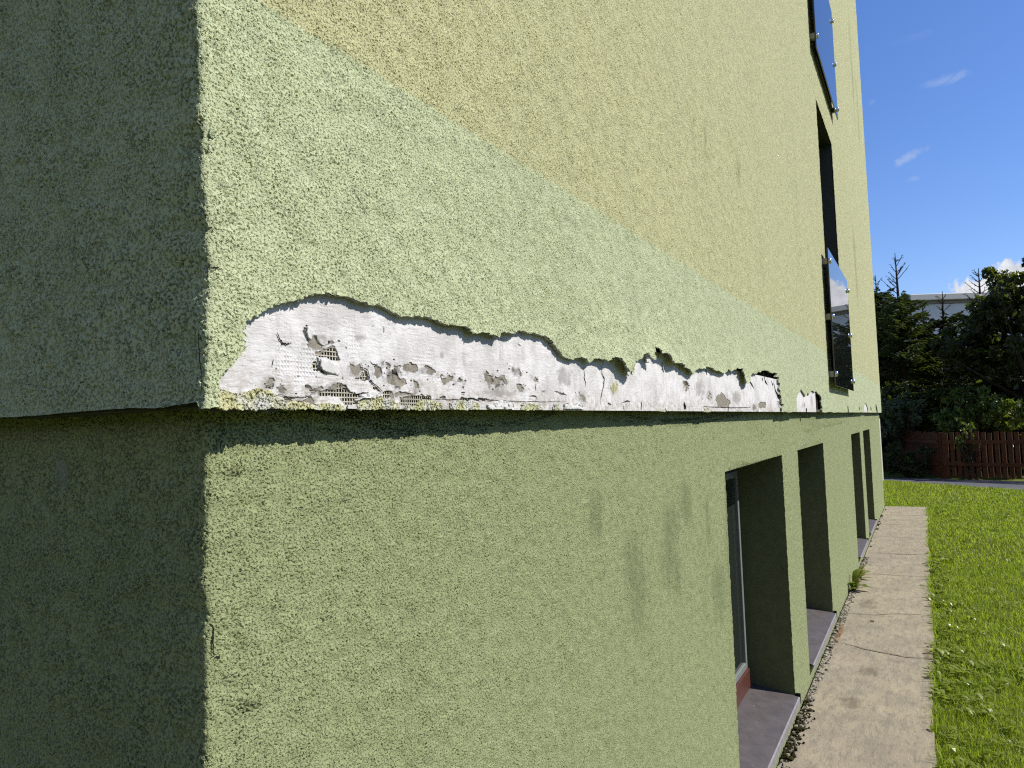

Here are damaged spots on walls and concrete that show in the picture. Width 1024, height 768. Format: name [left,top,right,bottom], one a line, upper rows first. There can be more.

flaking render [214,293,783,413]
flaking render [796,389,816,415]